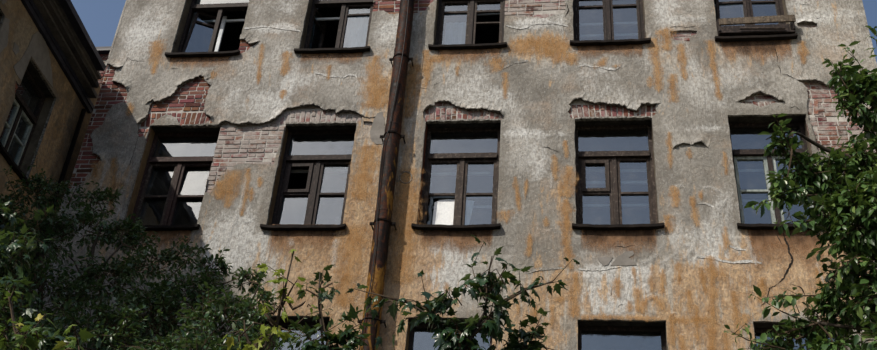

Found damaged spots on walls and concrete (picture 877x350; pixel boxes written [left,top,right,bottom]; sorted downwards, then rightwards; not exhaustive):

spalling [373,0,400,14]
spalling [413,0,433,13]
spalling [505,0,566,18]
spalling [69,58,132,188]
spalling [136,67,372,193]
spalling [421,93,506,122]
spalling [567,90,660,119]
spalling [734,83,786,107]
spalling [797,72,876,154]
rust [385,169,417,283]
water stain [581,229,656,251]
water stain [748,229,822,262]